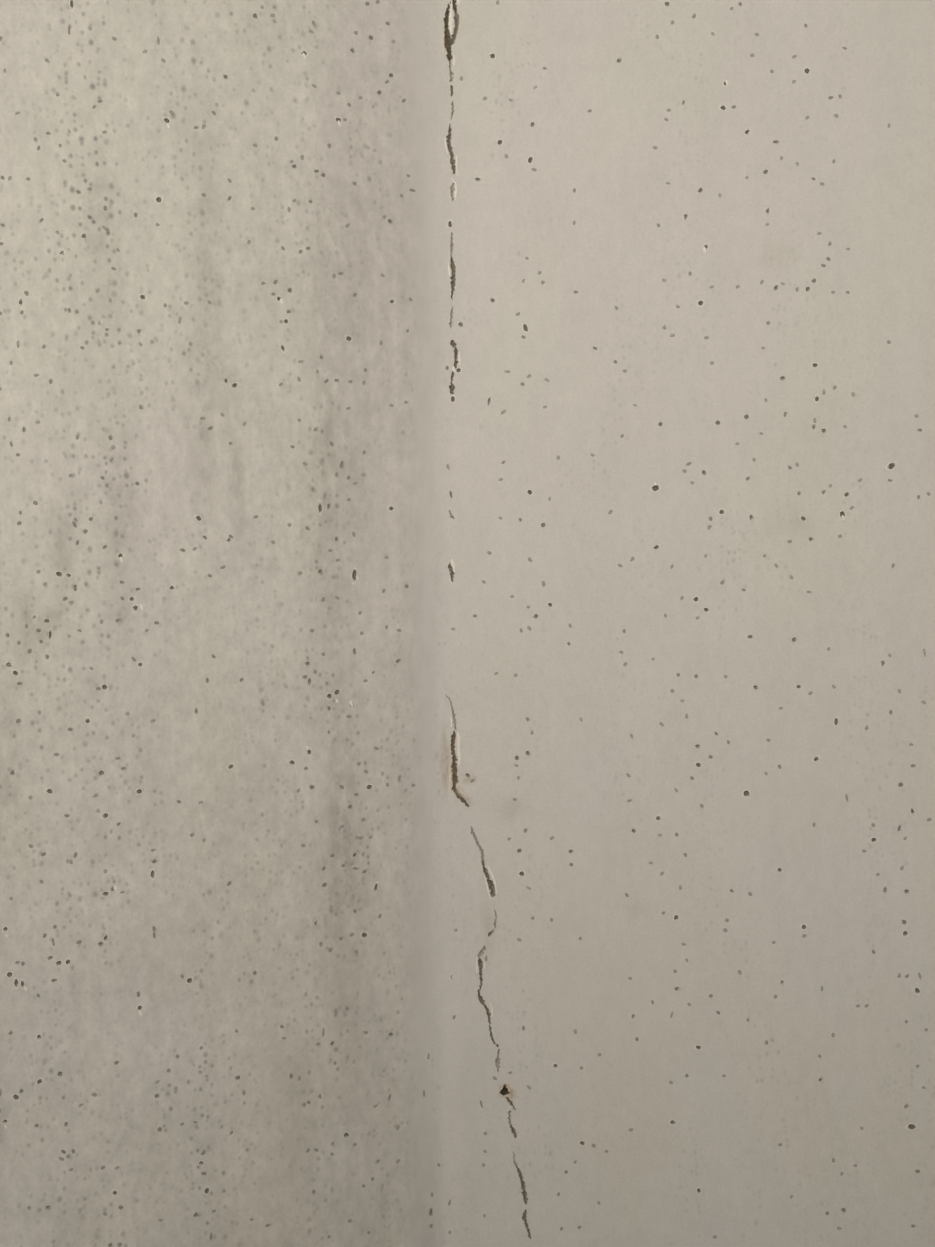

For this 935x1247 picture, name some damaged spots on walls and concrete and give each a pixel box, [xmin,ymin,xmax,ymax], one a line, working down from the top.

crack [445,62,458,200]
crack [448,233,461,394]
crack [447,559,455,582]
crack [445,695,531,1238]